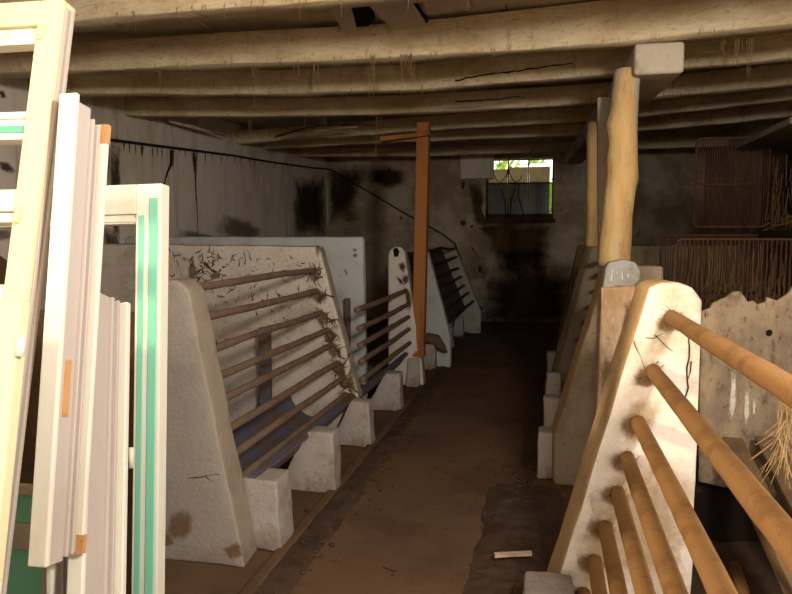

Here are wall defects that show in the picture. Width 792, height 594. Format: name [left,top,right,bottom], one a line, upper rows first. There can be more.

crack [455,95,525,103]
crack [455,63,572,82]
crack [164,149,198,230]
damp [294,170,361,233]
damp [371,168,403,187]
crack [633,333,692,397]